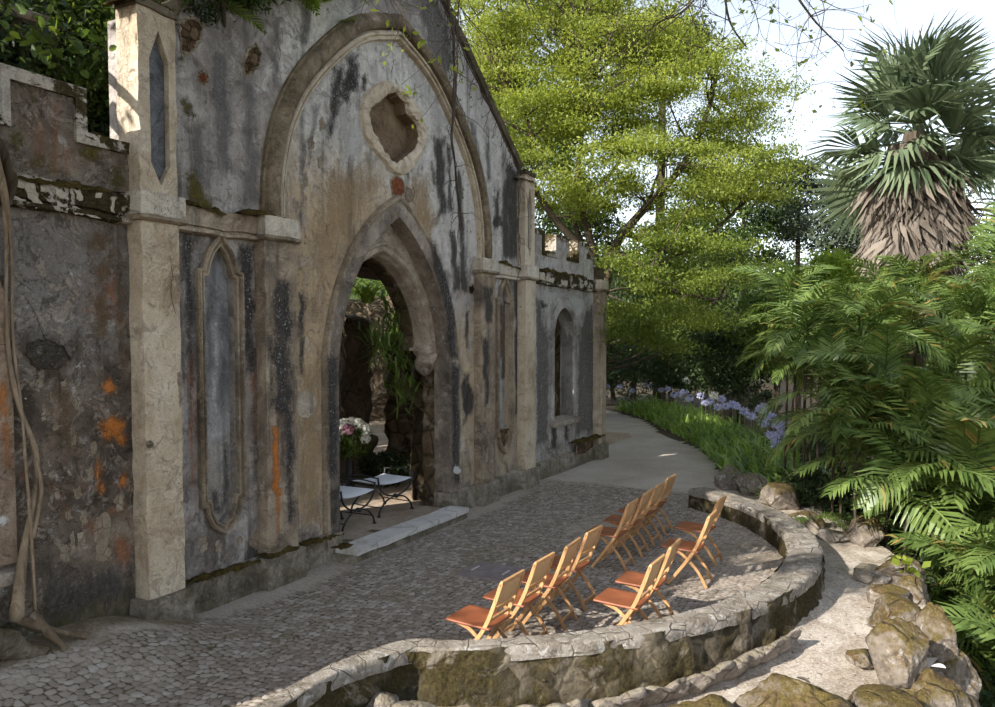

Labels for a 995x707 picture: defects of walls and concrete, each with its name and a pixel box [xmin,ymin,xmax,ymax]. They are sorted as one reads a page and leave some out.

spalling [175,16,205,56]
spalling [242,42,262,77]
damp [326,53,366,136]
peeling [13,181,101,219]
spalling [390,175,414,203]
damp [468,121,518,260]
damp [410,62,489,482]
flaking render [60,441,124,566]
rust [99,417,125,445]
rust [271,427,281,533]
damp [268,279,341,522]
damp [483,282,518,414]